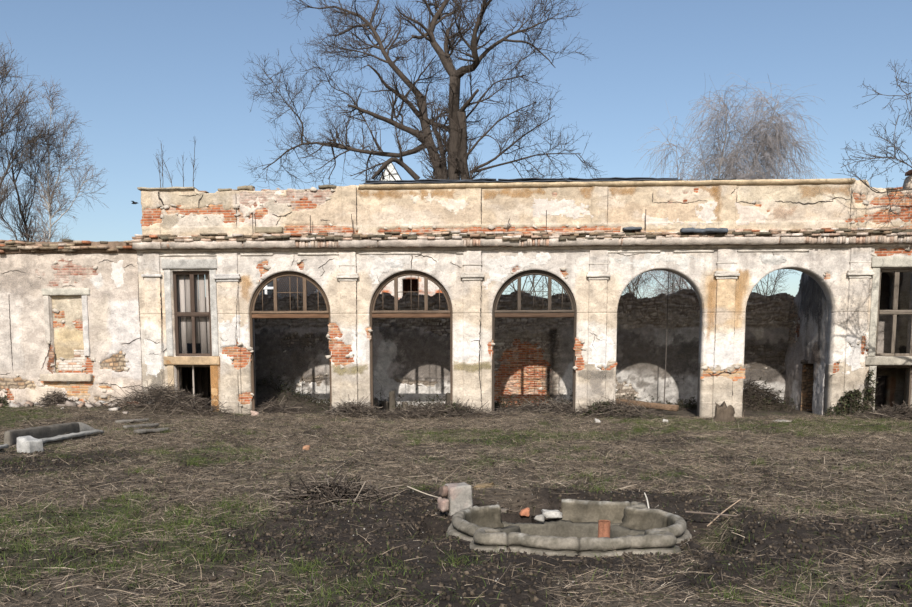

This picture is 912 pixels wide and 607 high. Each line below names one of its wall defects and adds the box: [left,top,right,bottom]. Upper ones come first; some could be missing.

flaking render [140,187,335,227]
flaking render [284,223,358,234]
crack [776,194,852,216]
flaking render [845,192,912,229]
flaking render [35,259,125,289]
flaking render [52,308,83,331]
flaking render [0,341,129,403]
flaking render [218,315,254,370]
flaking render [297,323,373,387]
flaking render [700,344,786,381]